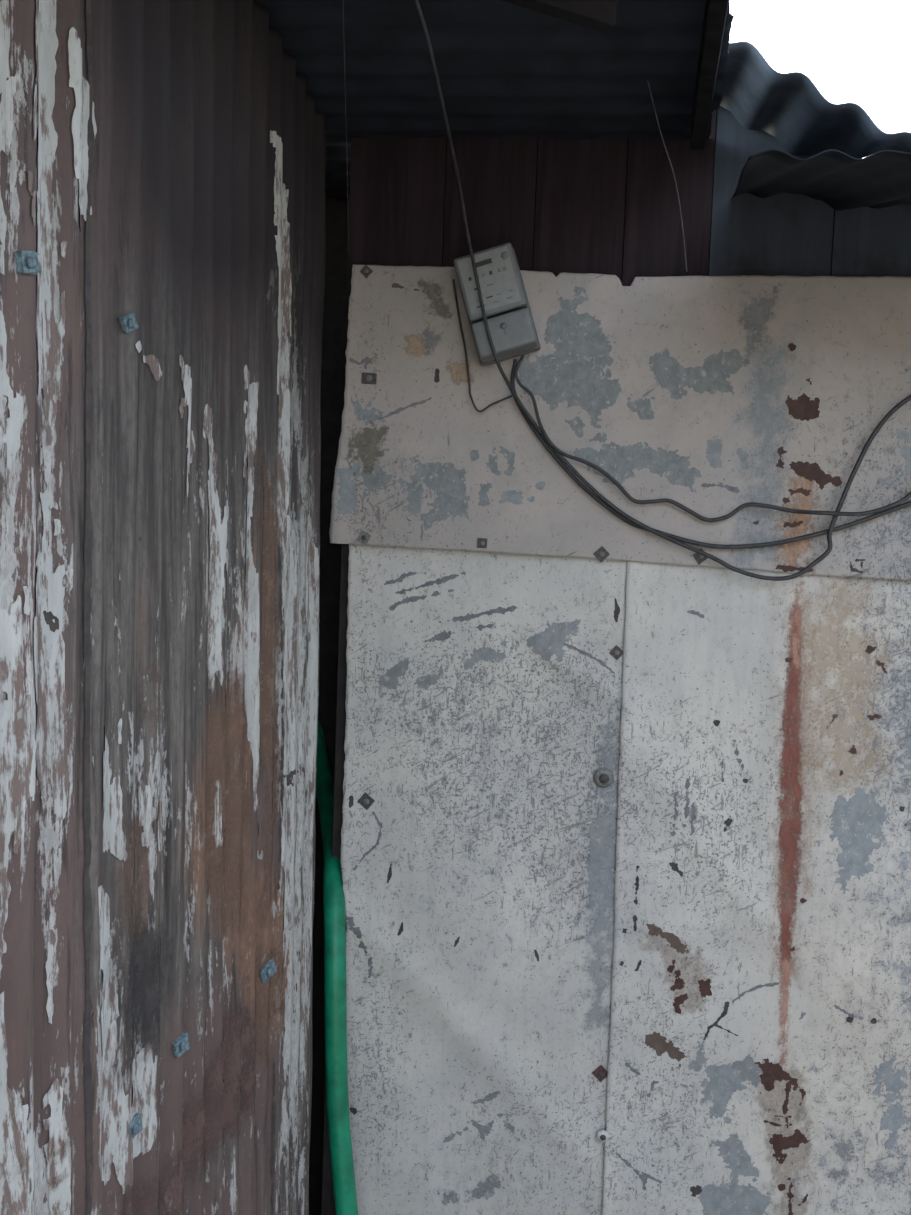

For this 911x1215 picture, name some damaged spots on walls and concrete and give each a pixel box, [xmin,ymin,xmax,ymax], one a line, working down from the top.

peeling [0,0,97,1215]
peeling [136,341,162,381]
peeling [179,354,229,689]
peeling [243,365,263,859]
peeling [270,130,319,958]
rust [785,378,820,421]
peeling [92,885,157,1194]
peeling [103,718,162,862]
peeling [213,779,223,848]
rust [645,1031,688,1067]
rust [646,924,712,1014]
rust [755,446,842,1215]